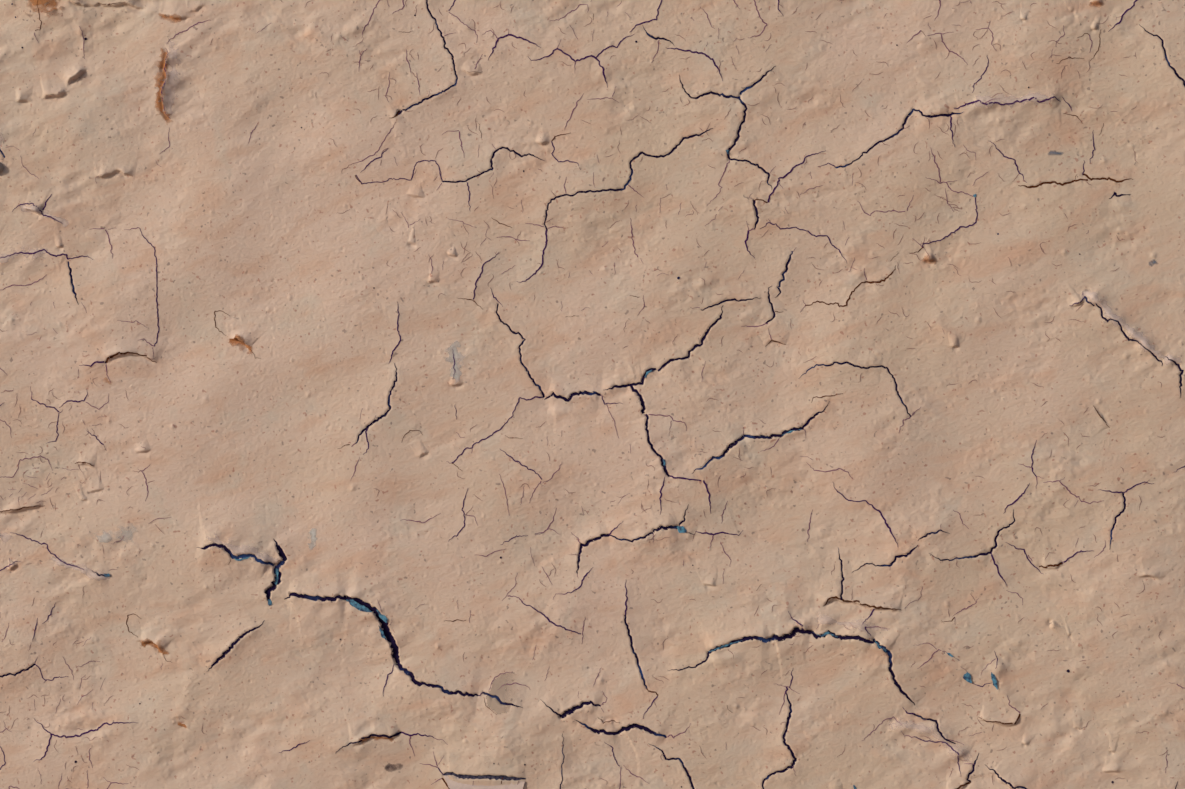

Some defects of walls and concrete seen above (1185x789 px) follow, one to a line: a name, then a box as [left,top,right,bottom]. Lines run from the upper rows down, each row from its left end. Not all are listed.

peeling [8,0,191,103]
crack [156,20,219,167]
crack [0,120,171,595]
crack [328,0,1185,789]
crack [0,600,137,789]
crack [196,516,522,756]
spalling [420,752,526,789]